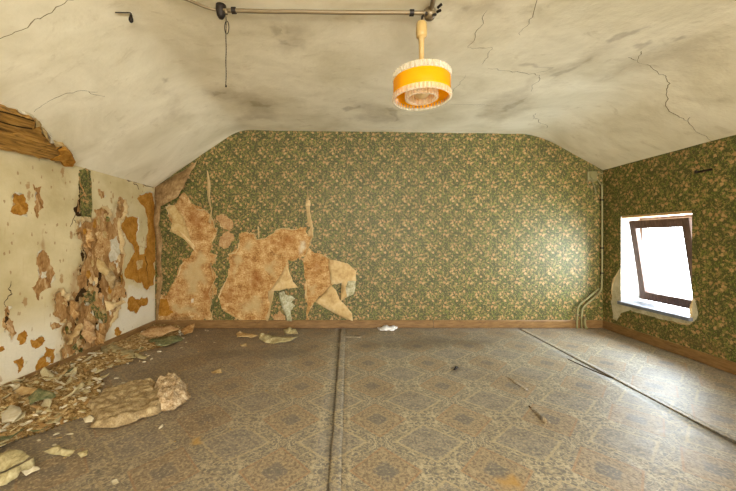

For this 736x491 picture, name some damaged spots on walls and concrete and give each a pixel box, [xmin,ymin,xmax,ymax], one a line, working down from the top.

crack [0,0,74,39]
crack [518,0,538,35]
crack [467,11,551,91]
spalling [16,108,76,167]
crack [0,90,105,152]
crack [628,51,711,141]
peeling [10,184,44,218]
peeling [2,191,155,373]
flaking render [168,246,213,320]
flaking render [228,232,259,283]
flaking render [233,291,270,320]
flaking render [304,280,321,302]